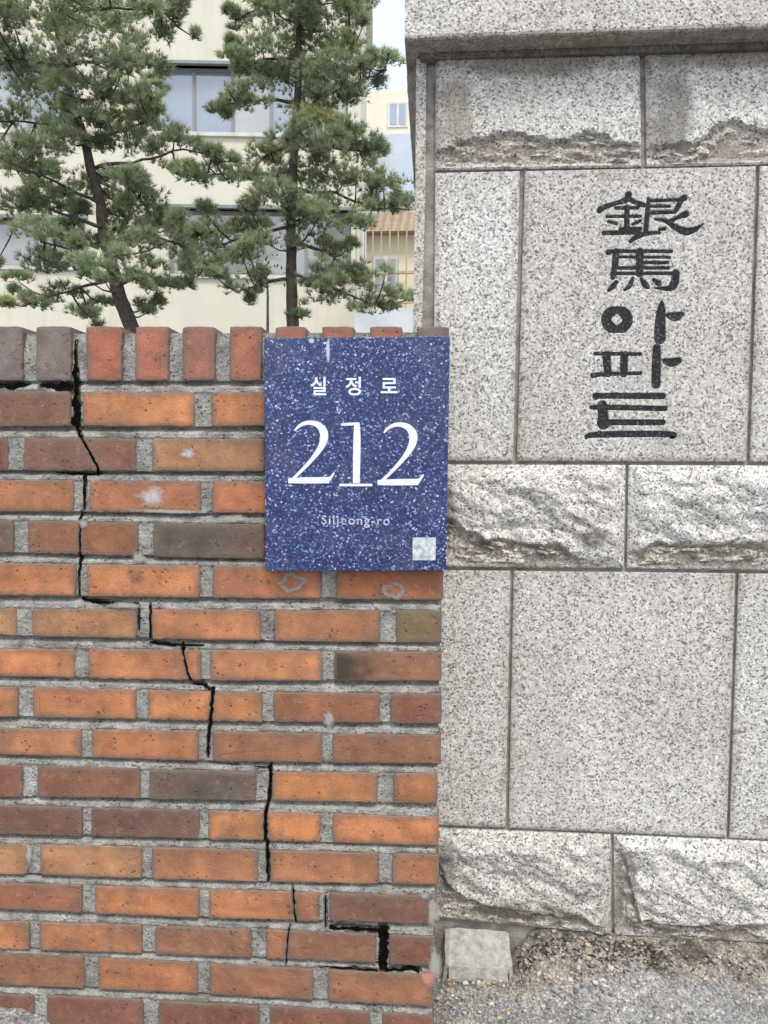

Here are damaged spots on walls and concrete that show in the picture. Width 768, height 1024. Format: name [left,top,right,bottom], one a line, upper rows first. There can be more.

spalling [442,133,634,167]
spalling [652,124,768,163]
crack [0,340,297,966]
crack [318,925,420,973]